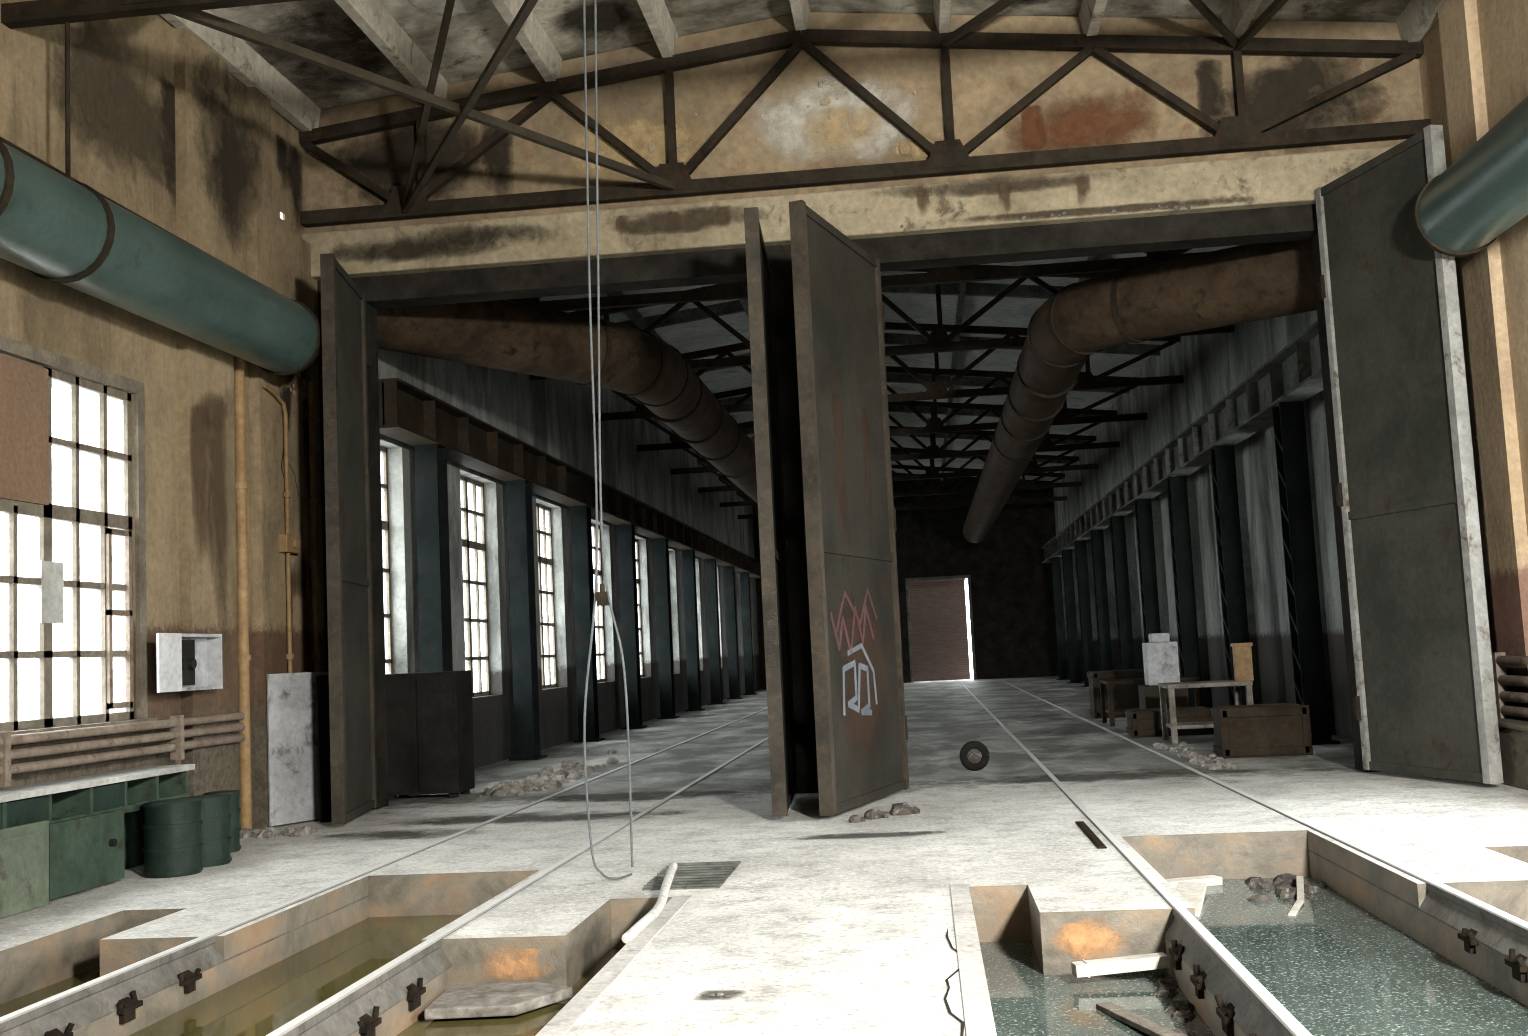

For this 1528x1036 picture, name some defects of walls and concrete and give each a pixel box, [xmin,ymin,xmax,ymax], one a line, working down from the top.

damp [57,21,176,196]
flaking render [755,79,935,156]
damp [192,398,226,576]
crack [944,929,965,1036]
rust [1060,924,1117,957]